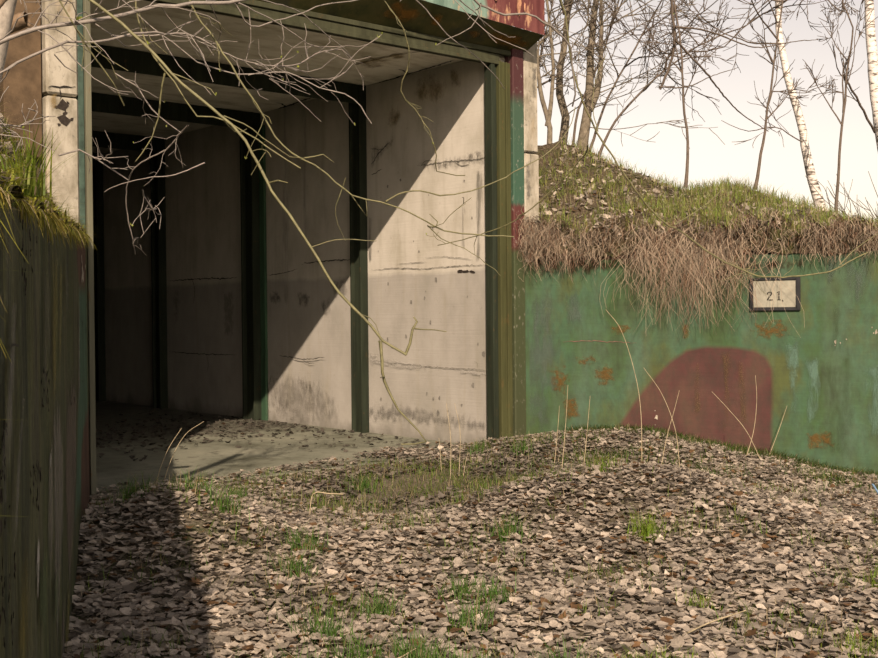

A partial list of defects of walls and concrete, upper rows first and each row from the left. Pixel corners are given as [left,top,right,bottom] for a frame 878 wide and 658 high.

crack [417,157,485,166]